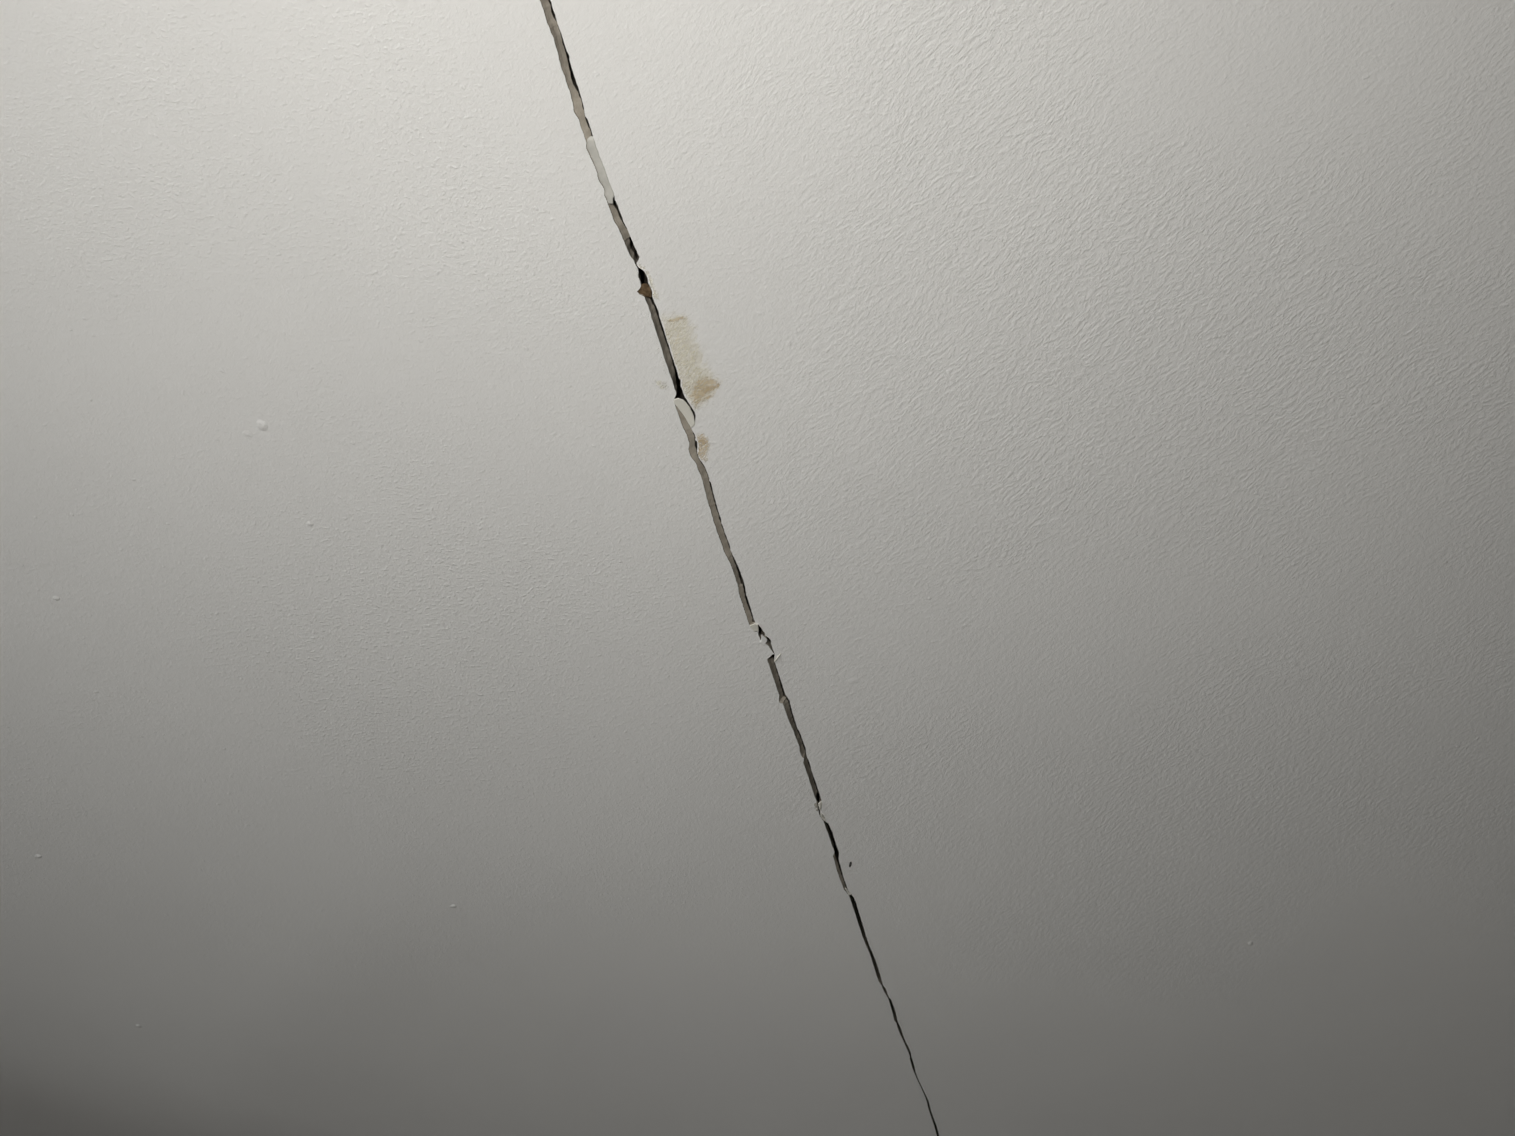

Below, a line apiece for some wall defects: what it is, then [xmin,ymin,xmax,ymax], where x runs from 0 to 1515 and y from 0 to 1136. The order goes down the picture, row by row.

crack [540,0,939,1136]